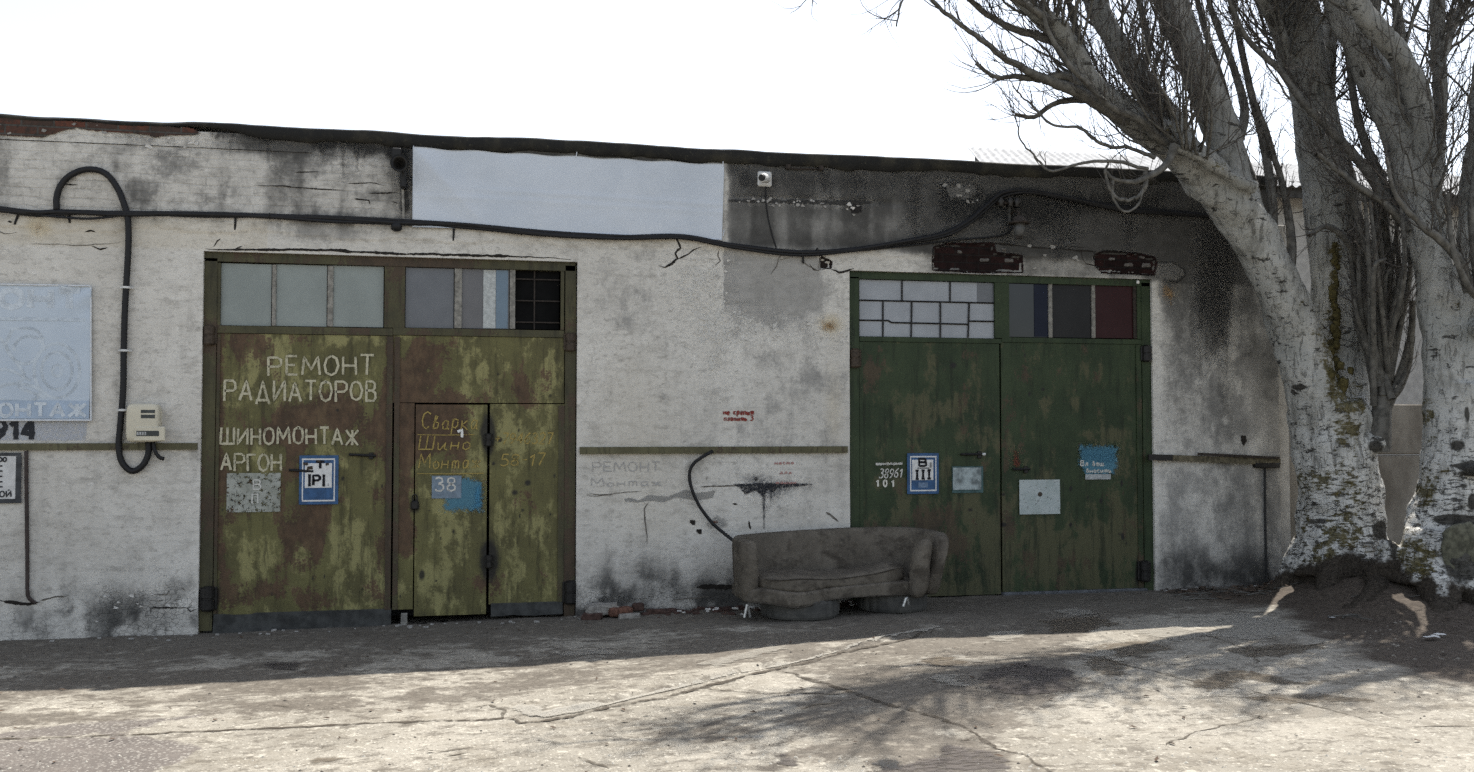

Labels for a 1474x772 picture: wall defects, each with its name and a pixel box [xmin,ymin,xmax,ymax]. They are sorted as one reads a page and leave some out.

damp [313,141,409,212]
crack [0,626,1052,772]